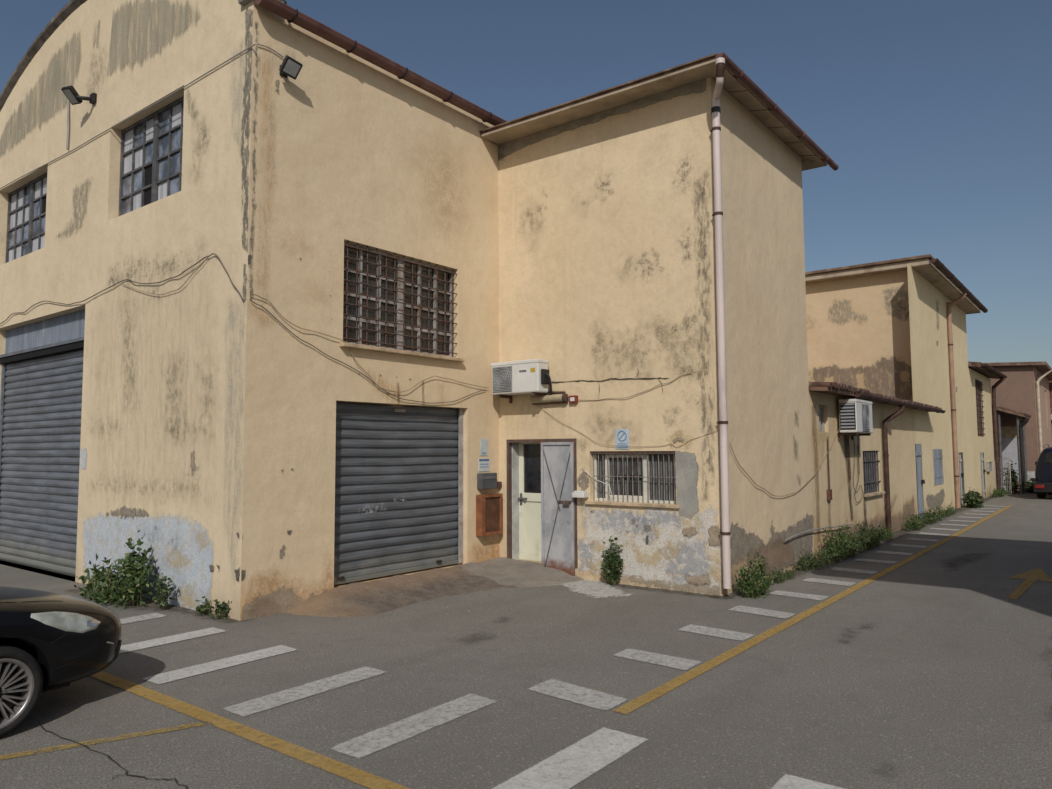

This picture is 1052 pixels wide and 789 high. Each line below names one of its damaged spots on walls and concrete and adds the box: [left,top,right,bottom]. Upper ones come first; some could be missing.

peeling [884,289,909,320]
peeling [813,357,913,401]
peeling [83,505,219,611]
peeling [577,469,814,595]
crack [36,720,187,789]